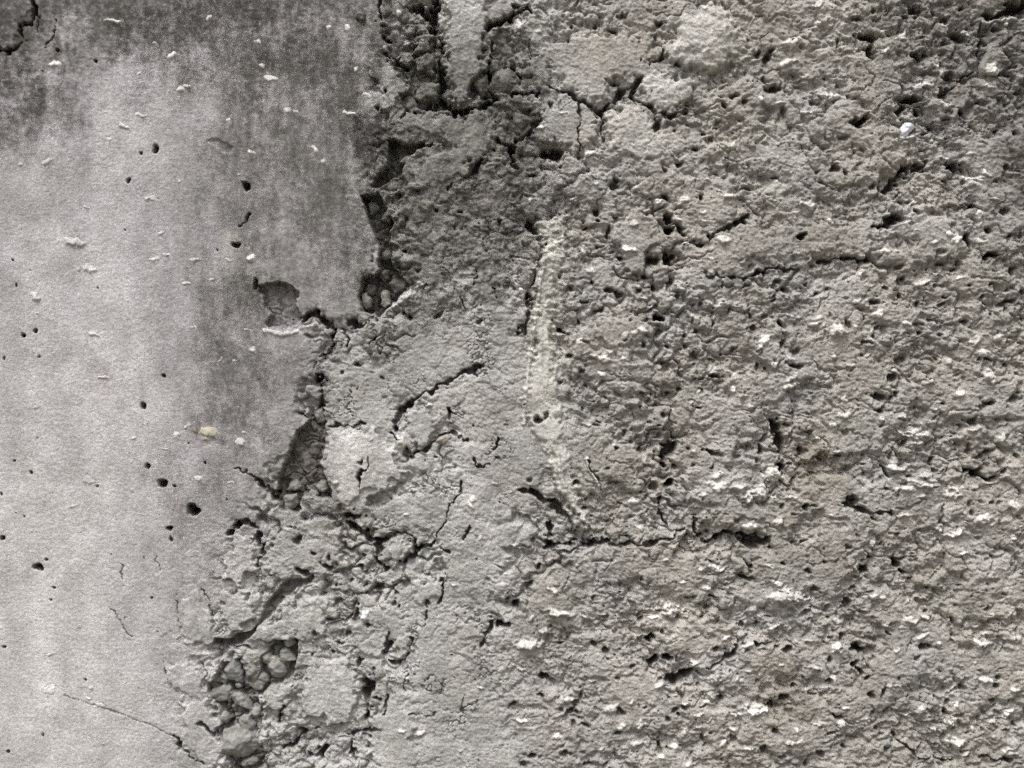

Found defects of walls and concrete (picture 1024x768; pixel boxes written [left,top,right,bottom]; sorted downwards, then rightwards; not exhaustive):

spalling [388,38,441,125]
spalling [468,5,541,106]
crack [375,0,688,191]
damp [0,0,392,425]
spalling [259,281,320,336]
spalling [359,129,444,318]
spalling [513,0,1024,768]
crack [227,499,267,569]
crack [239,468,295,501]
spalling [191,407,371,768]
spalling [366,480,406,510]
crack [278,220,771,768]